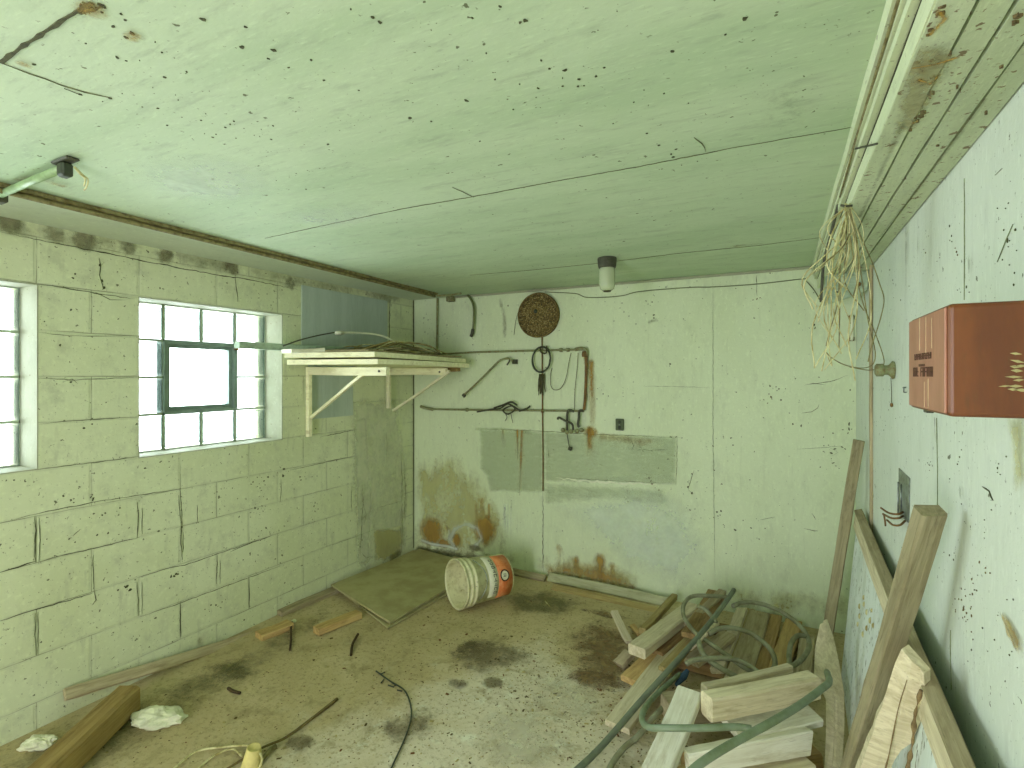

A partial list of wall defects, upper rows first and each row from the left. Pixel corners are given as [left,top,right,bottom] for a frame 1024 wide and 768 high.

crack [0,2,112,99]
crack [3,232,297,300]
corrosion [422,519,460,546]
corrosion [475,499,496,543]
crack [0,489,279,646]
corrosion [550,556,627,586]